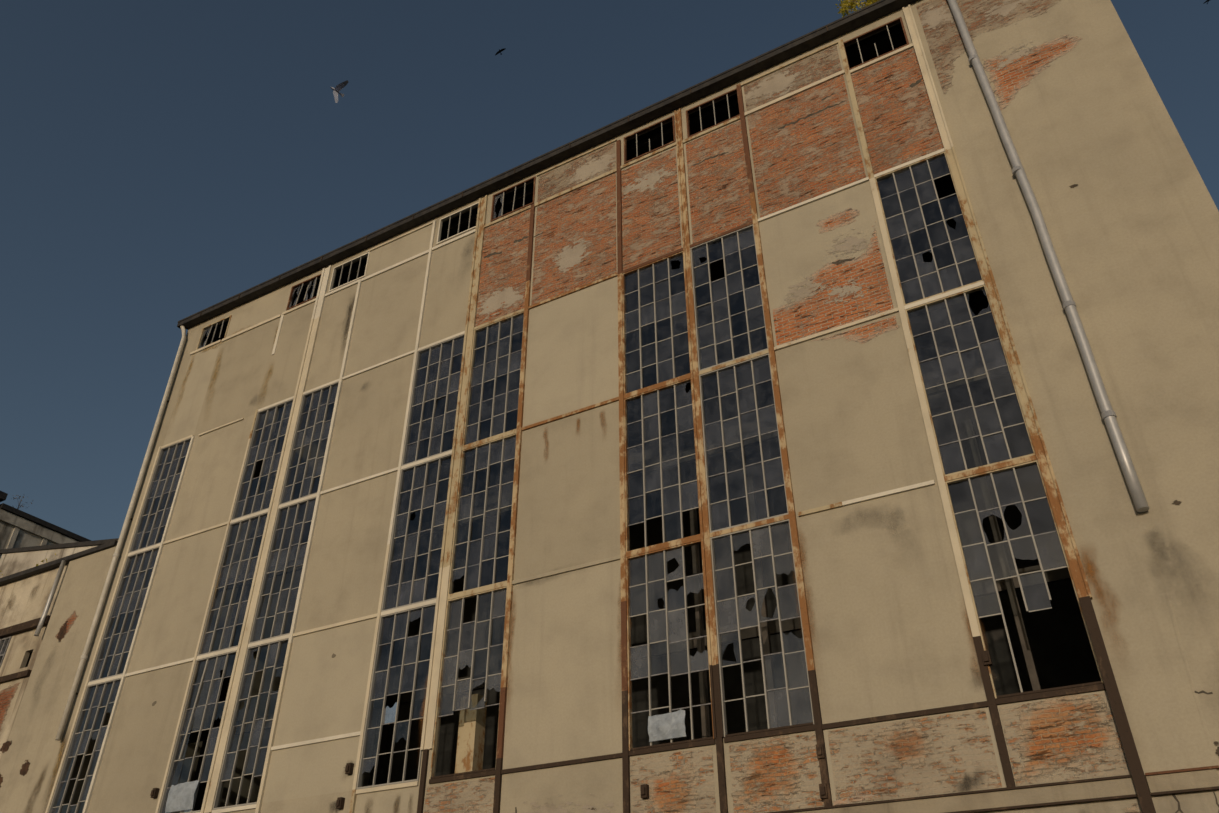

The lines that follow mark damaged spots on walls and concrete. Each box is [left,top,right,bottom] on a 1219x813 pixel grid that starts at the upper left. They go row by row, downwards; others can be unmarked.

spalling [982,34,1082,110]
spalling [475,0,1060,346]
spalling [630,747,716,813]
spalling [729,692,1130,813]
crack [1172,794,1183,813]